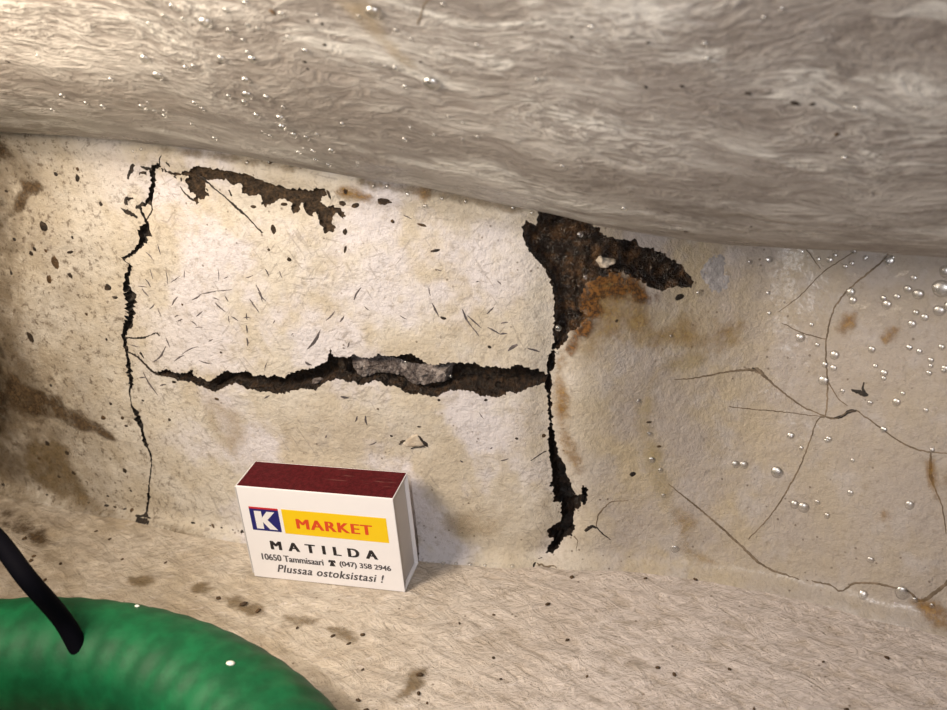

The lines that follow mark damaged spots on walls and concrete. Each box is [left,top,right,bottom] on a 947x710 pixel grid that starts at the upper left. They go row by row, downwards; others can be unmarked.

damp [29,247,73,284]
corrosion [566,272,649,355]
crack [121,156,627,568]
corrosion [557,388,567,413]
crack [668,249,947,602]